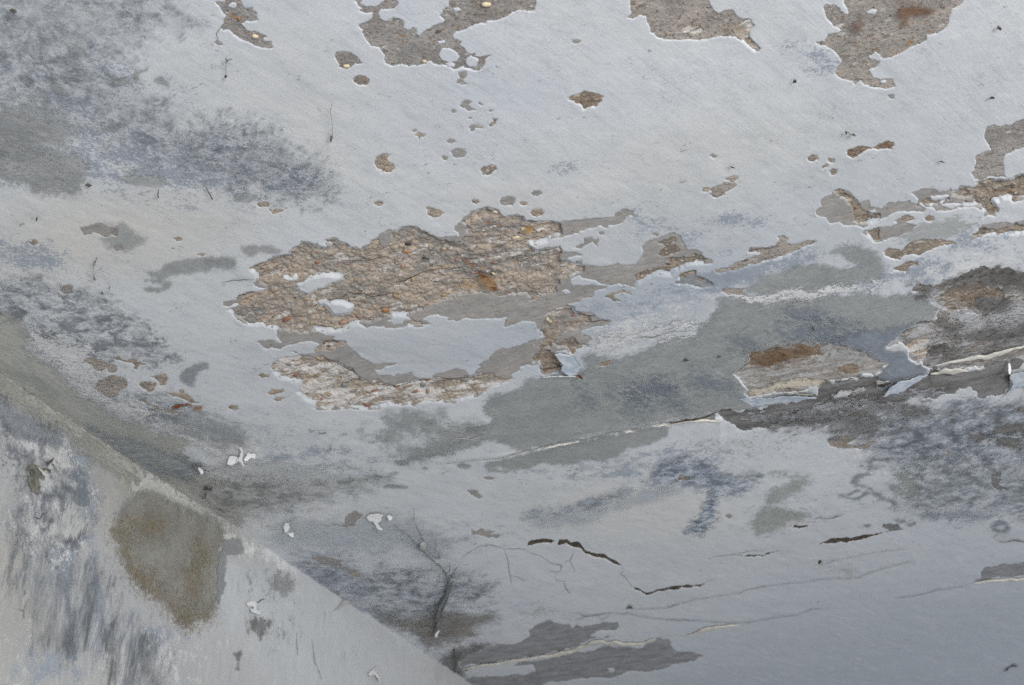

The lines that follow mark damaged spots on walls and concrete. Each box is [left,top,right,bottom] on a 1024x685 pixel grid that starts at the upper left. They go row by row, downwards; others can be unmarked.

leakage [0,0,346,217]
spalling [214,0,273,49]
spalling [355,0,536,85]
spalling [627,0,760,52]
spalling [816,0,962,99]
spalling [816,119,1024,271]
spalling [223,190,815,410]
leakage [358,246,1024,539]
spalling [703,262,1024,449]
leakage [0,270,500,685]
crack [466,515,910,624]
peeling [460,620,703,685]